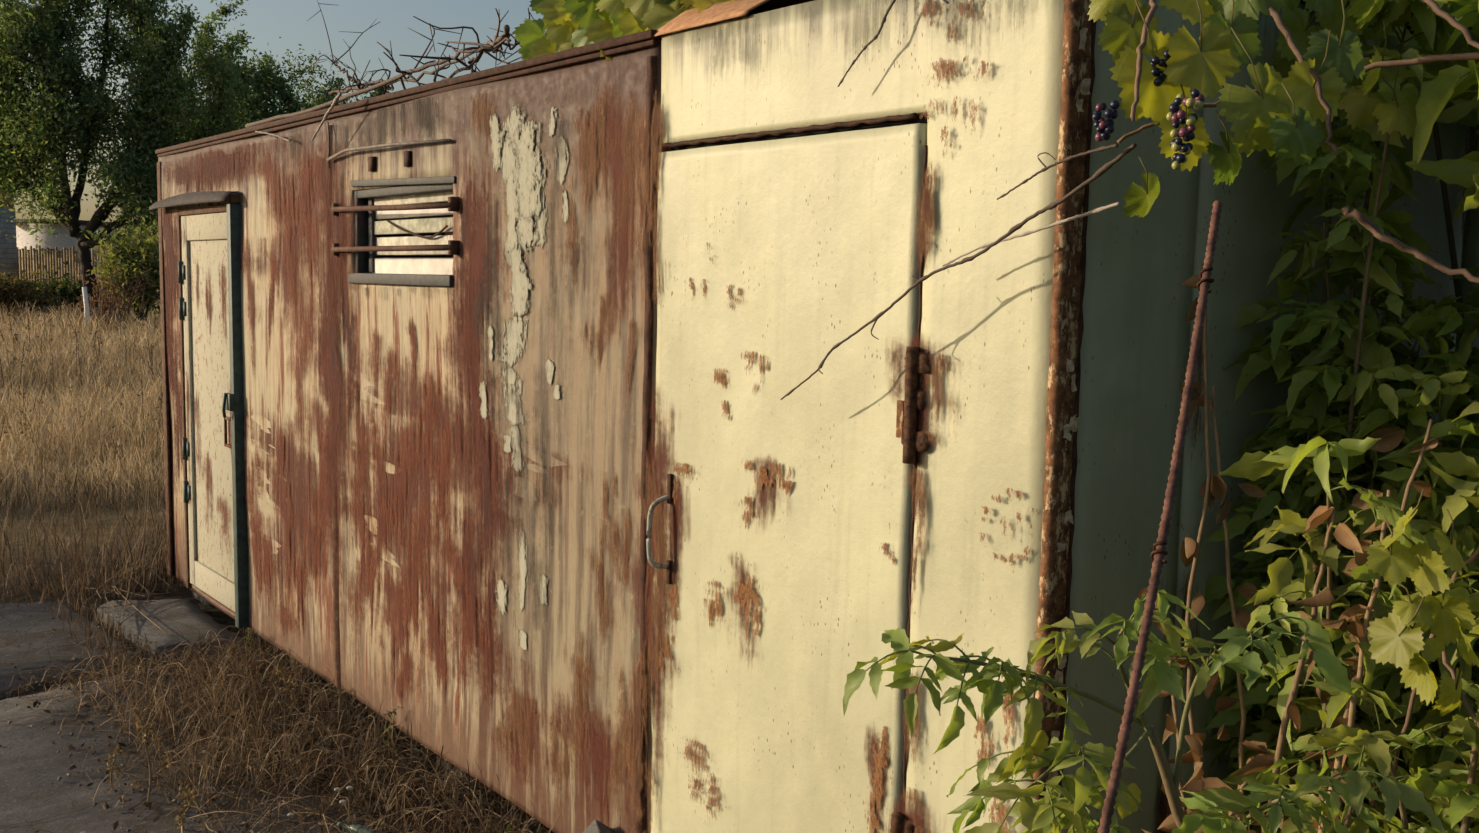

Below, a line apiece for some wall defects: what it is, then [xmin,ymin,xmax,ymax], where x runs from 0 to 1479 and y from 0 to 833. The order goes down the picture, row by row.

rust [161,94,727,833]
peeling [495,525,548,615]
peeling [517,629,528,650]
peeling [479,101,569,472]
rust [561,0,991,656]
rust [863,674,931,833]